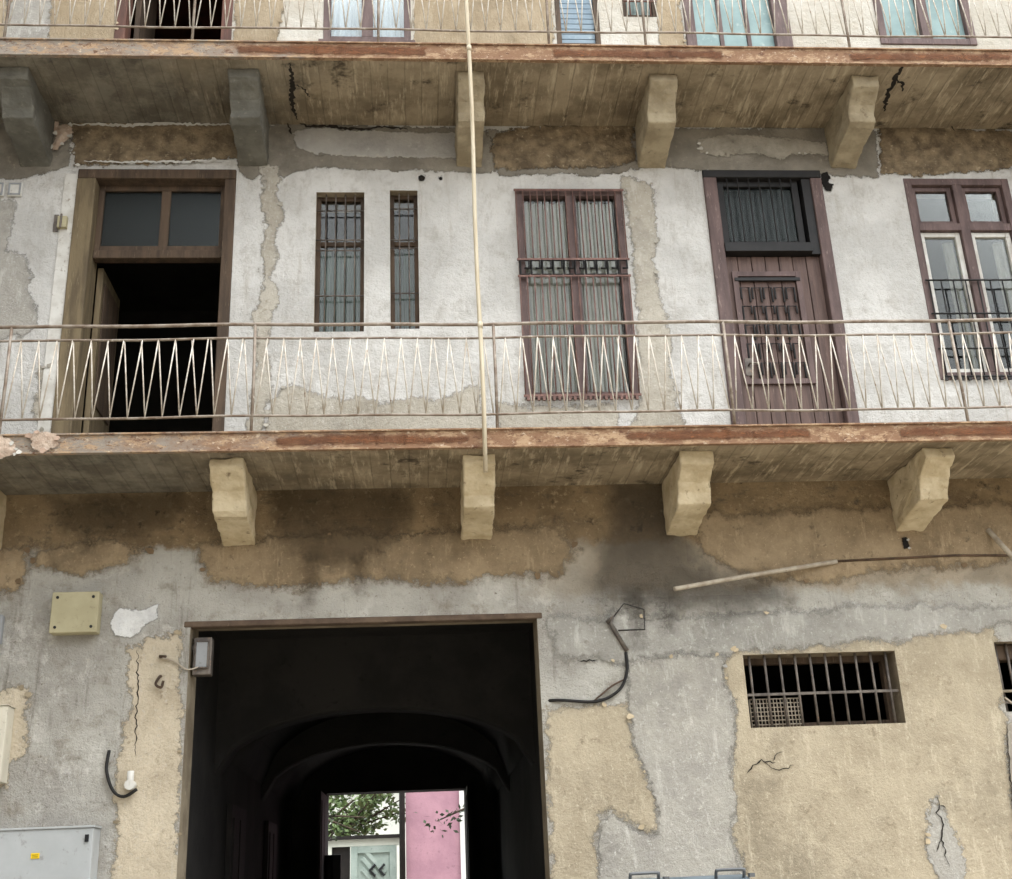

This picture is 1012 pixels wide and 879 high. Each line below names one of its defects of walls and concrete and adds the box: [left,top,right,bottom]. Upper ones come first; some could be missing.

rust [237,45,426,56]
rust [553,49,722,58]
crack [287,63,408,134]
crack [883,67,905,111]
flaking render [490,125,638,173]
rust [626,429,810,440]
rust [900,426,1012,437]
flaking render [0,538,154,594]
crack [747,752,791,773]
flaking render [542,602,1012,879]
crack [935,797,949,864]